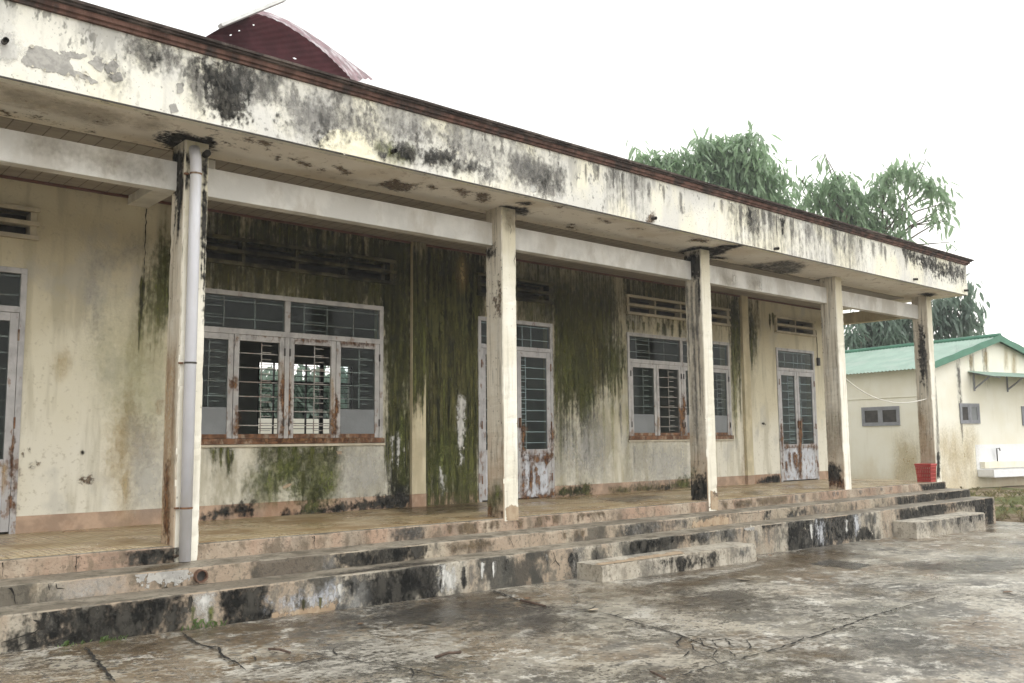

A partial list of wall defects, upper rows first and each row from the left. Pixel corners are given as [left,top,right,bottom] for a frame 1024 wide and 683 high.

peeling [21,44,123,84]
peeling [169,83,184,113]
damp [125,37,374,311]
mould [390,118,565,216]
rust [233,375,366,444]
rust [2,435,16,509]
rust [521,425,556,499]
rust [780,420,817,478]
damp [2,521,597,652]
damp [587,496,876,612]
crack [183,633,453,679]
crack [494,591,808,664]